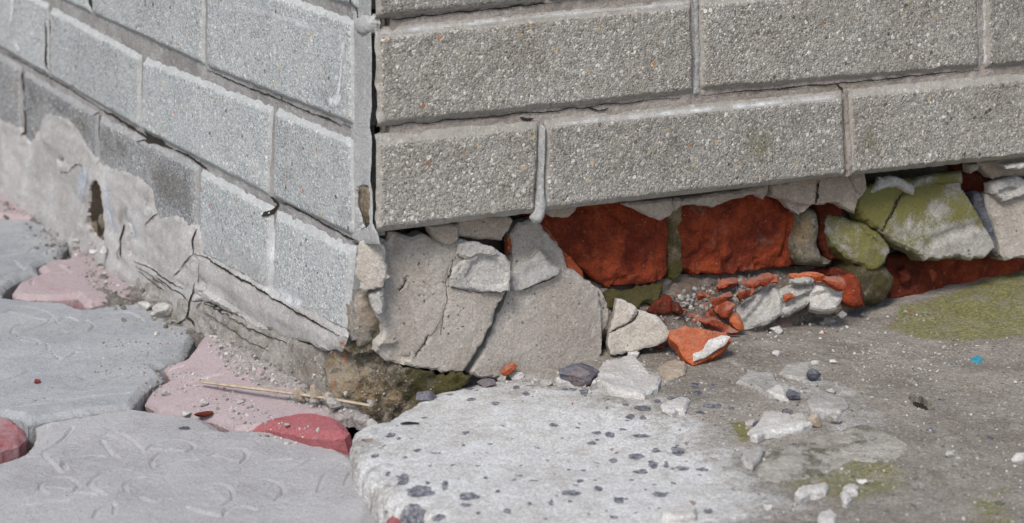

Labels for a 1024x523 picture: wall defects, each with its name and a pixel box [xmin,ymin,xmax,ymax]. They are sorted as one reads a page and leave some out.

crack [116,213,339,350]
flaking render [346,186,390,347]
crack [413,256,556,358]
spalling [424,216,561,294]
flaking render [545,207,576,218]
flaking render [620,174,915,221]
flaking render [788,277,814,286]
flaking render [962,157,1024,258]